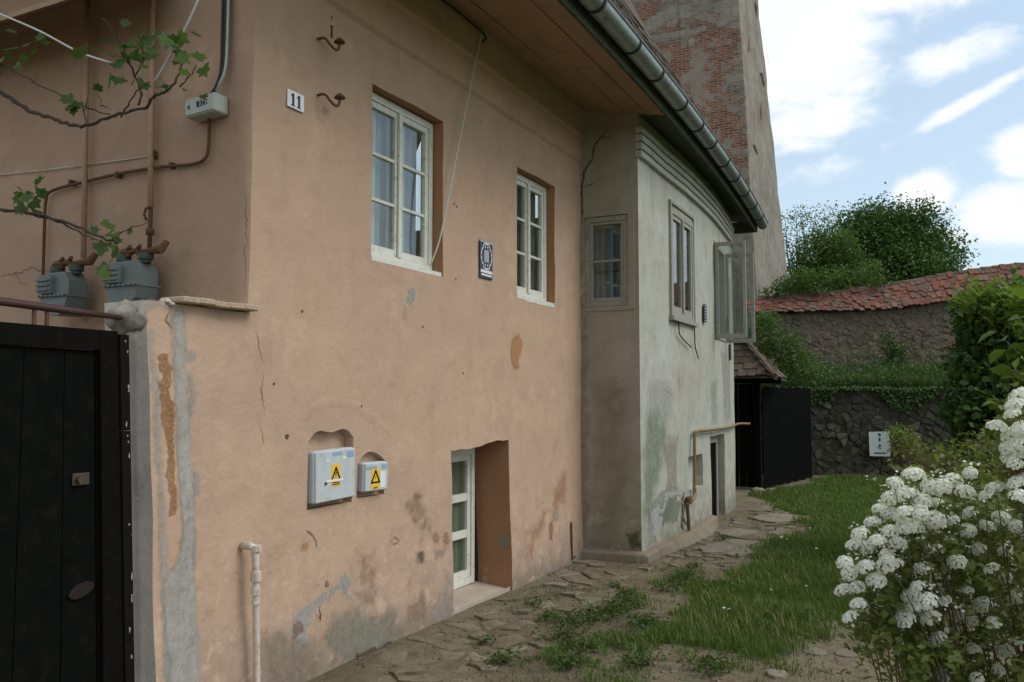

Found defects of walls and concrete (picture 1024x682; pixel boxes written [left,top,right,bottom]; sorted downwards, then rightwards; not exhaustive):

crack [580,124,610,225]
crack [241,194,249,294]
peeling [105,298,200,682]
spalling [648,487,705,544]
peeling [290,574,352,646]